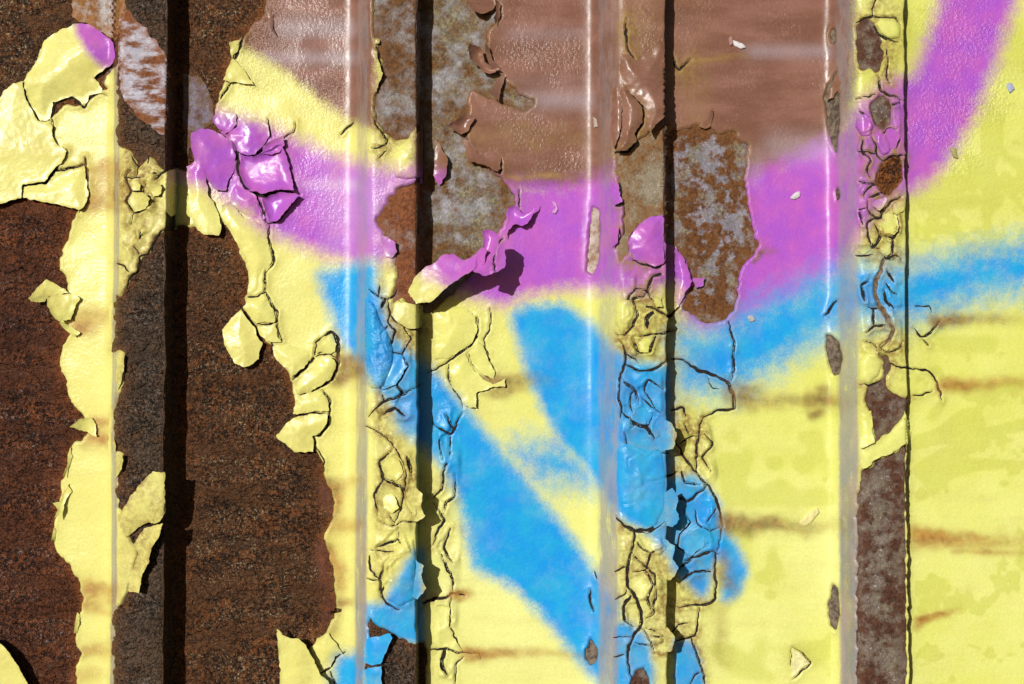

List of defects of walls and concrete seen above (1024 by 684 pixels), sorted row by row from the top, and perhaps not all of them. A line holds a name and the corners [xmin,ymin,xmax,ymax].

crack [22,68,107,212]
corrosion [89,420,109,443]
peeling [0,0,343,684]
crack [366,285,507,682]
peeling [371,0,538,408]
peeling [638,338,651,353]
crack [588,183,736,684]
peeling [587,39,759,323]
peeling [856,19,883,72]
peeling [857,96,905,255]
peeling [856,356,911,684]
crack [855,0,942,400]